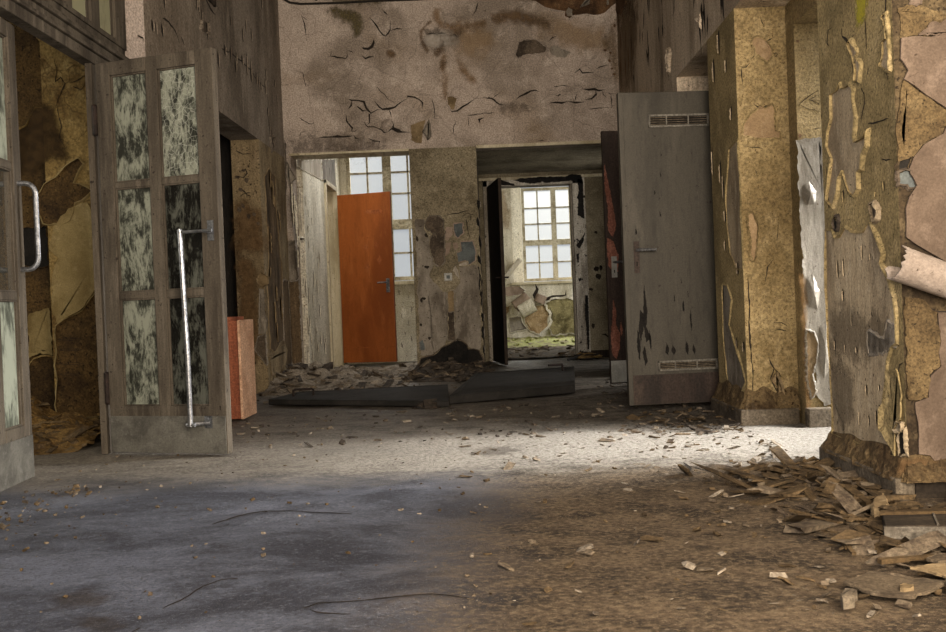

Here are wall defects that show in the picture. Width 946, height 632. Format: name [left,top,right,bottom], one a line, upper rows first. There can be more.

peeling [9,22,42,130]
crack [284,65,612,149]
peeling [513,0,663,80]
peeling [693,0,727,84]
peeling [23,157,100,418]
peeling [398,200,485,364]
peeling [505,258,575,337]
peeling [796,0,946,461]